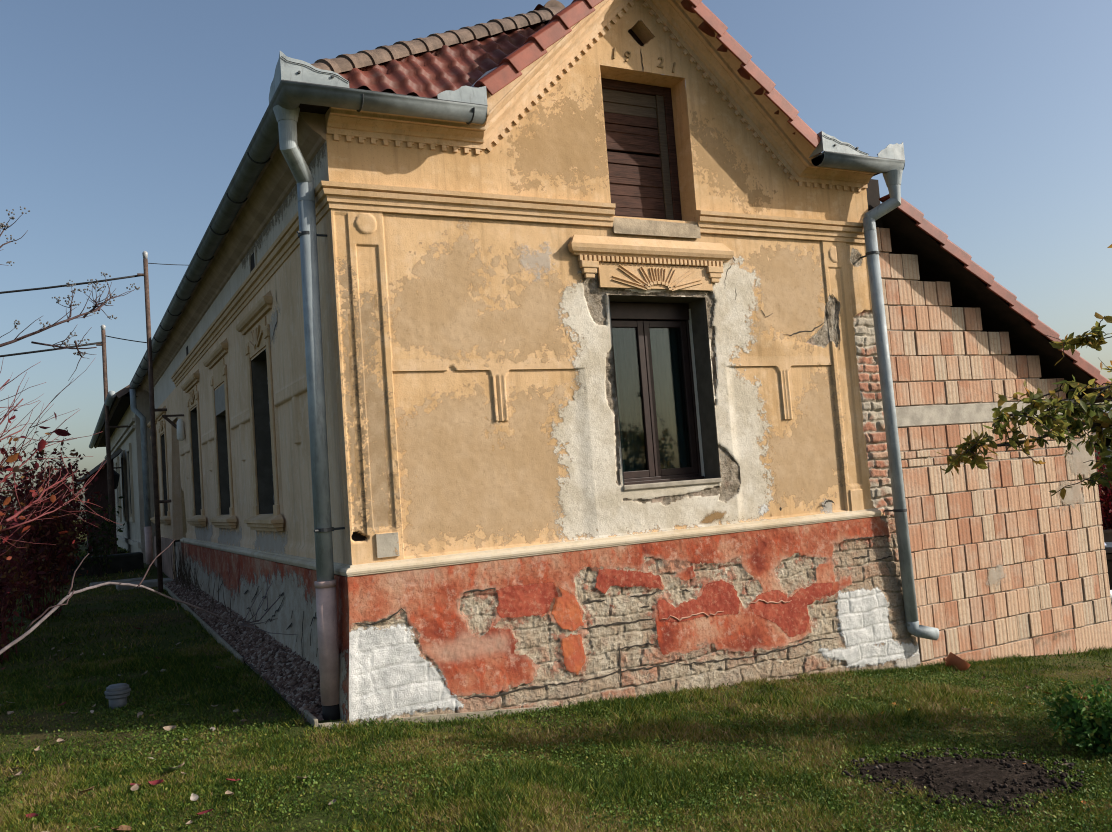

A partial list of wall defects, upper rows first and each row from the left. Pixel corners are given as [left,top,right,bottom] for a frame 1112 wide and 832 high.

spalling [183,553,319,669]
peeling [335,219,575,558]
spalling [339,310,917,723]
spalling [582,273,717,405]